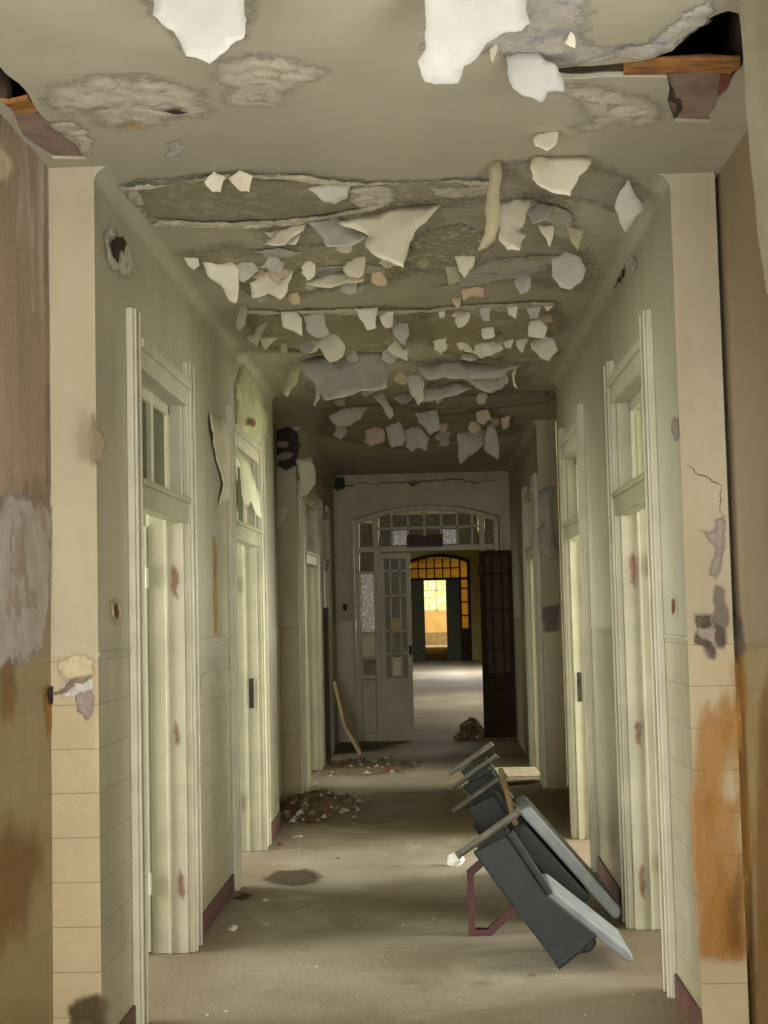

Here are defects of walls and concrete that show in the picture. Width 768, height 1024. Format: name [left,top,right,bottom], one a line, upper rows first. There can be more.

peeling [146,0,328,108]
peeling [418,0,727,132]
peeling [0,74,210,506]
peeling [119,131,645,464]
peeling [209,412,262,518]
crack [687,464,723,514]
spalling [705,518,725,577]
spalling [48,654,94,720]
spalling [695,615,724,659]
corrosion [690,614,752,1018]